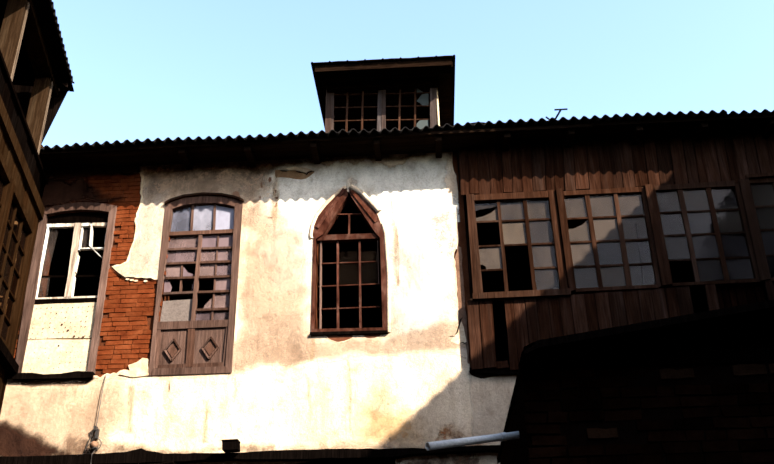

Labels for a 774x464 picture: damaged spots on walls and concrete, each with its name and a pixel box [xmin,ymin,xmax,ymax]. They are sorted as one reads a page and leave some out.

spalling [66,172,166,380]
spalling [259,167,314,207]
damp [137,153,464,368]
damp [0,386,131,454]